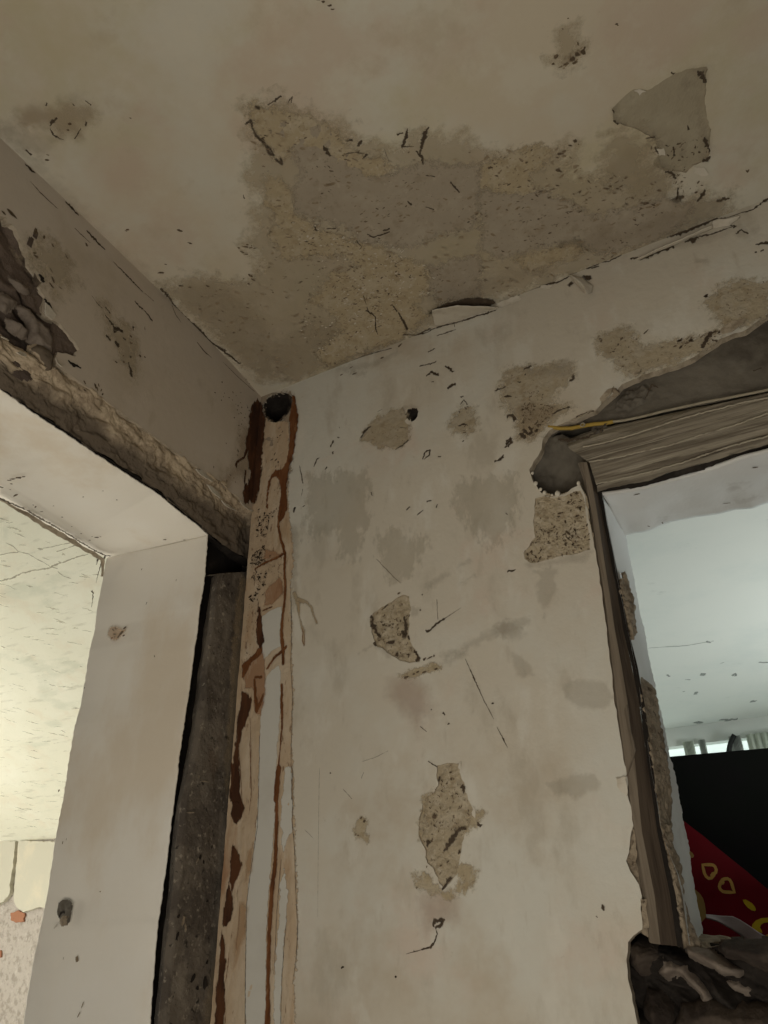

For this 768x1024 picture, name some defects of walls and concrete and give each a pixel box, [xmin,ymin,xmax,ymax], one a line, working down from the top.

spalling [552,42,586,69]
spalling [612,67,711,202]
spalling [0,221,81,382]
flaking render [673,318,746,349]
spalling [524,434,594,564]
corrosion [229,395,299,824]
spalling [370,592,442,679]
corrosion [265,684,283,1024]
spalling [413,761,484,900]
flaking render [627,828,641,886]
corrosion [214,845,251,1024]
spalling [629,899,768,1024]